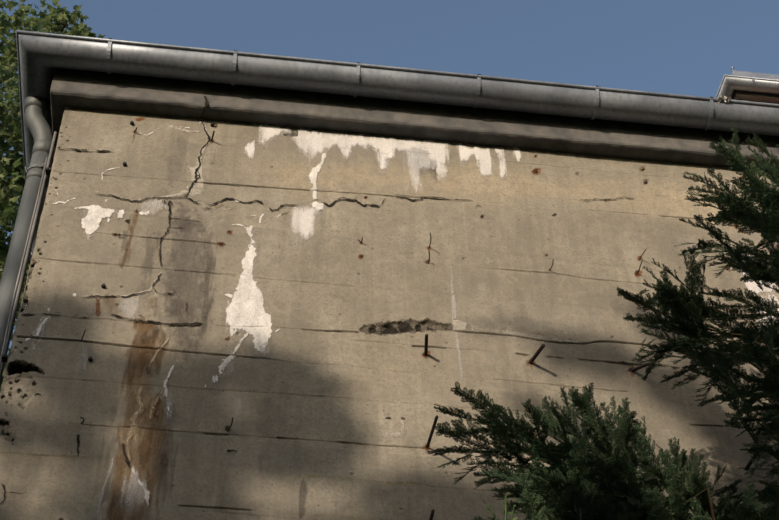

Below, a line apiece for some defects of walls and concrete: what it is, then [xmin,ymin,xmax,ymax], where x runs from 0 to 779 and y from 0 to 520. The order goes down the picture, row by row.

crack [82,96,295,343]
crack [321,194,482,207]
spalling [359,318,453,336]
spalling [1,359,45,399]
corrosion [109,319,167,520]
crack [122,441,130,468]